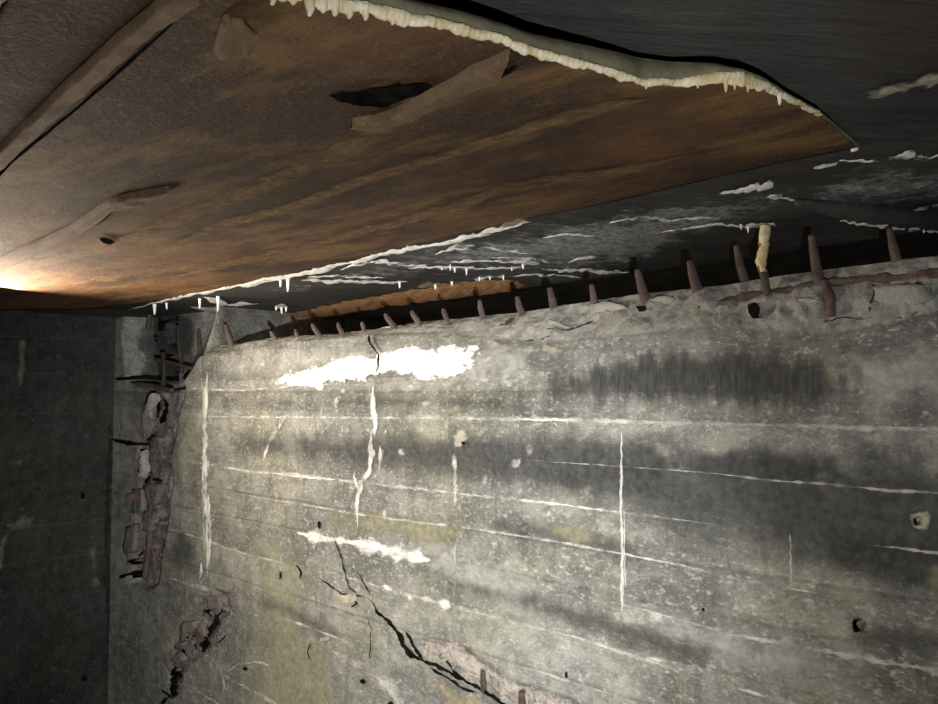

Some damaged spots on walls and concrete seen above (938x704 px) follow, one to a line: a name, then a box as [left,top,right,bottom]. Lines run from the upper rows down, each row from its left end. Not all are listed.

leakage [270,0,822,116]
crack [367,0,873,163]
crack [895,151,938,159]
crack [367,333,379,375]
leakage [129,171,938,315]
spalling [197,225,938,358]
spalling [112,352,179,579]
leakage [275,343,522,526]
leakage [298,532,429,562]
spalling [159,588,230,704]
crack [277,541,505,704]
spalling [416,640,586,704]